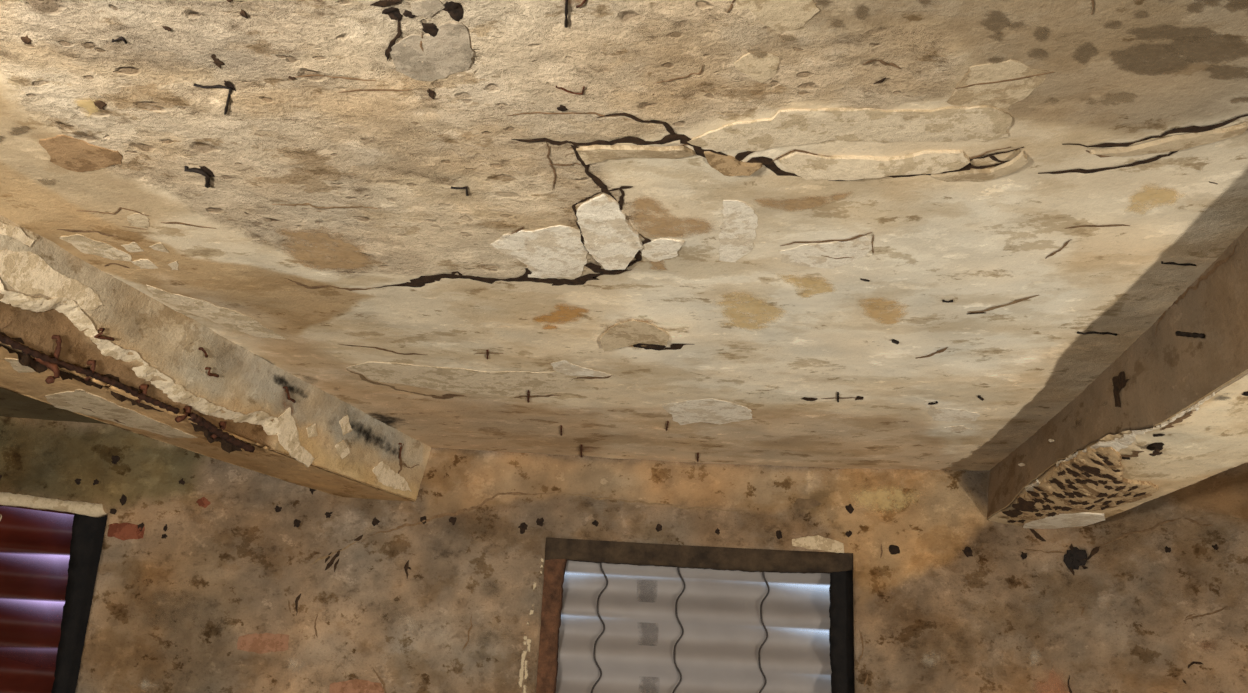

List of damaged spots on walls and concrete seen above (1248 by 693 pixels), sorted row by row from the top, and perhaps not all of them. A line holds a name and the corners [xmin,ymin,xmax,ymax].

peeling [39,131,123,172]
crack [288,60,1248,291]
crack [272,202,378,210]
flaking render [490,194,684,278]
flaking render [0,222,318,467]
spalling [600,319,694,352]
flaking render [335,415,352,459]
flaking render [372,461,412,492]
spalling [1002,392,1215,529]